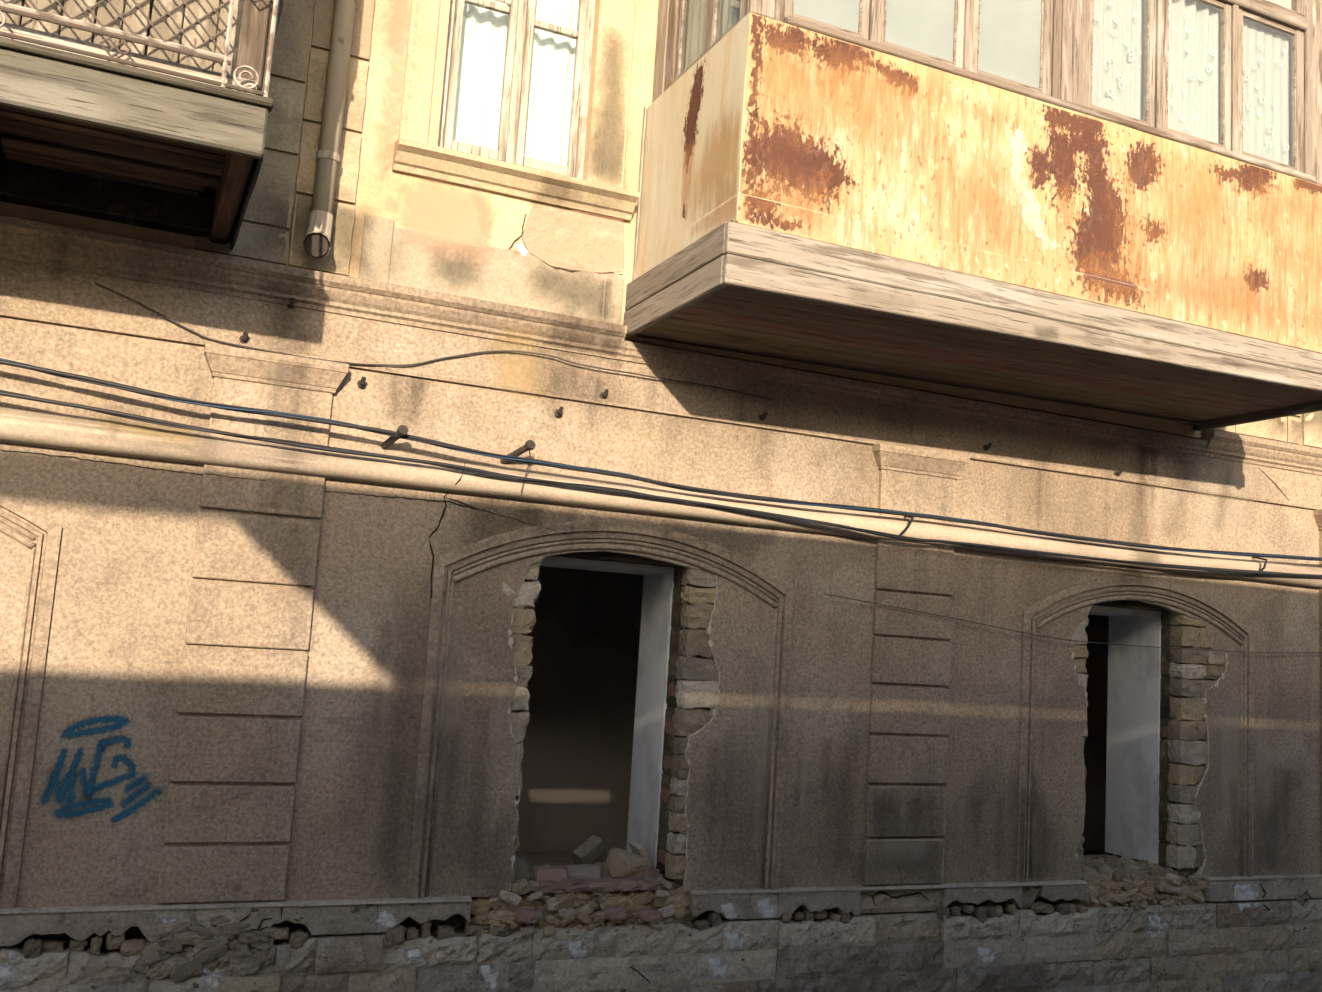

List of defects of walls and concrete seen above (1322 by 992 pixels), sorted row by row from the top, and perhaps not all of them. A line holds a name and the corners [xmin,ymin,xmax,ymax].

rust [681,58,707,173]
rust [739,14,918,234]
rust [1009,104,1168,309]
crack [327,464,571,598]
spalling [465,559,720,936]
spalling [1068,605,1229,934]
spalling [138,909,282,989]